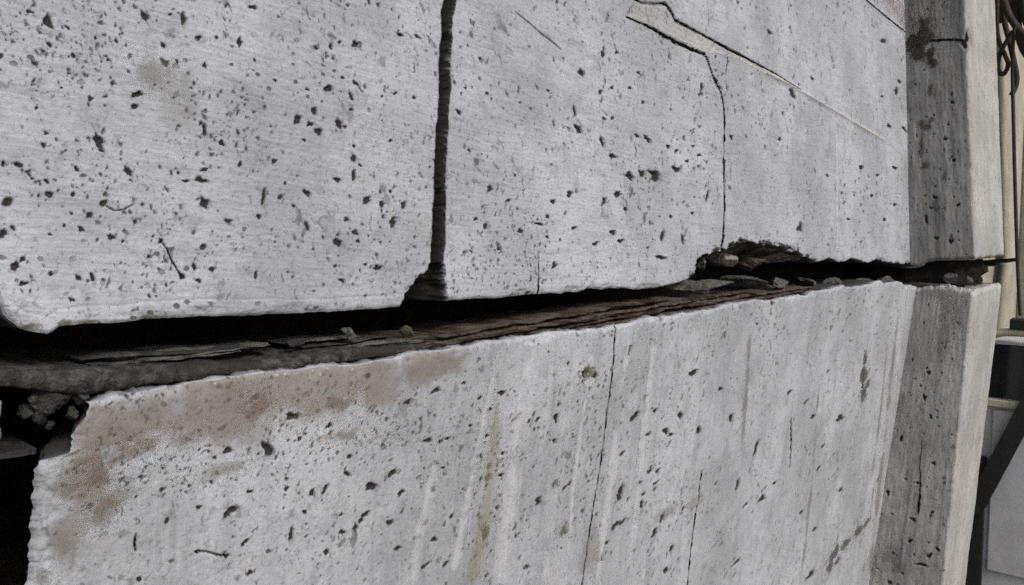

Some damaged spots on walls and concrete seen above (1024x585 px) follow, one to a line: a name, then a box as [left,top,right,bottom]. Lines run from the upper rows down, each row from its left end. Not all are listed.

crack [866,0,965,42]
crack [625,0,799,247]
crack [414,176,447,284]
spalling [704,244,802,263]
crack [581,326,615,585]